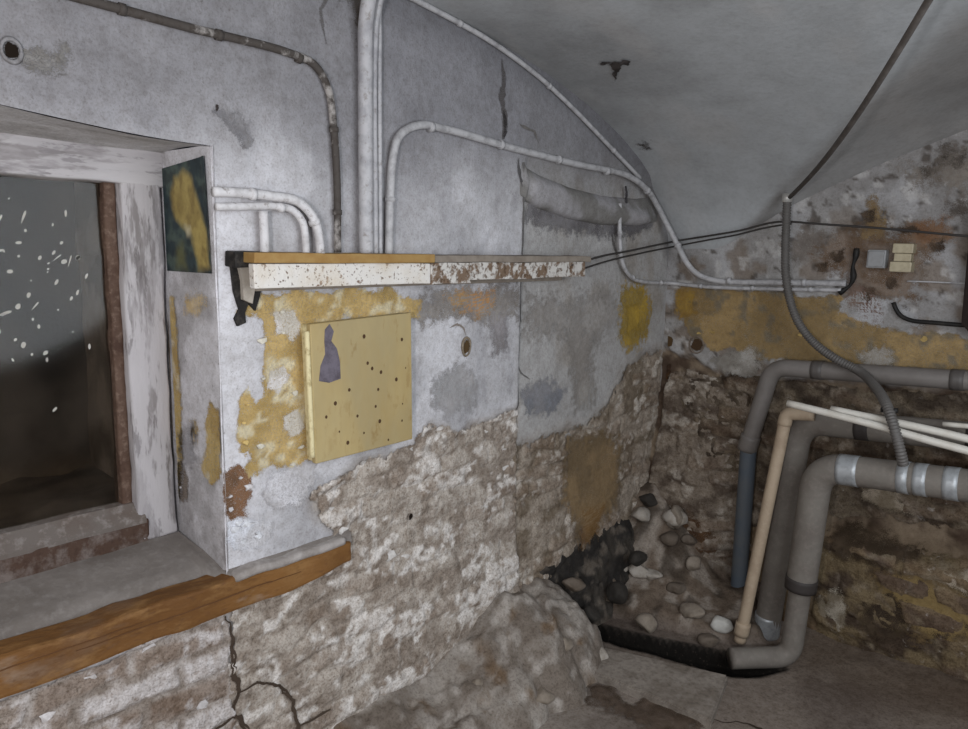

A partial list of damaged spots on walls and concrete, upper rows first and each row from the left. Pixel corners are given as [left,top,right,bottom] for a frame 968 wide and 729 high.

crack [498,61,539,142]
crack [517,158,525,255]
water stain [888,140,968,222]
crack [516,345,530,422]
spalling [0,280,968,729]
crack [216,616,331,729]
crack [714,719,762,729]